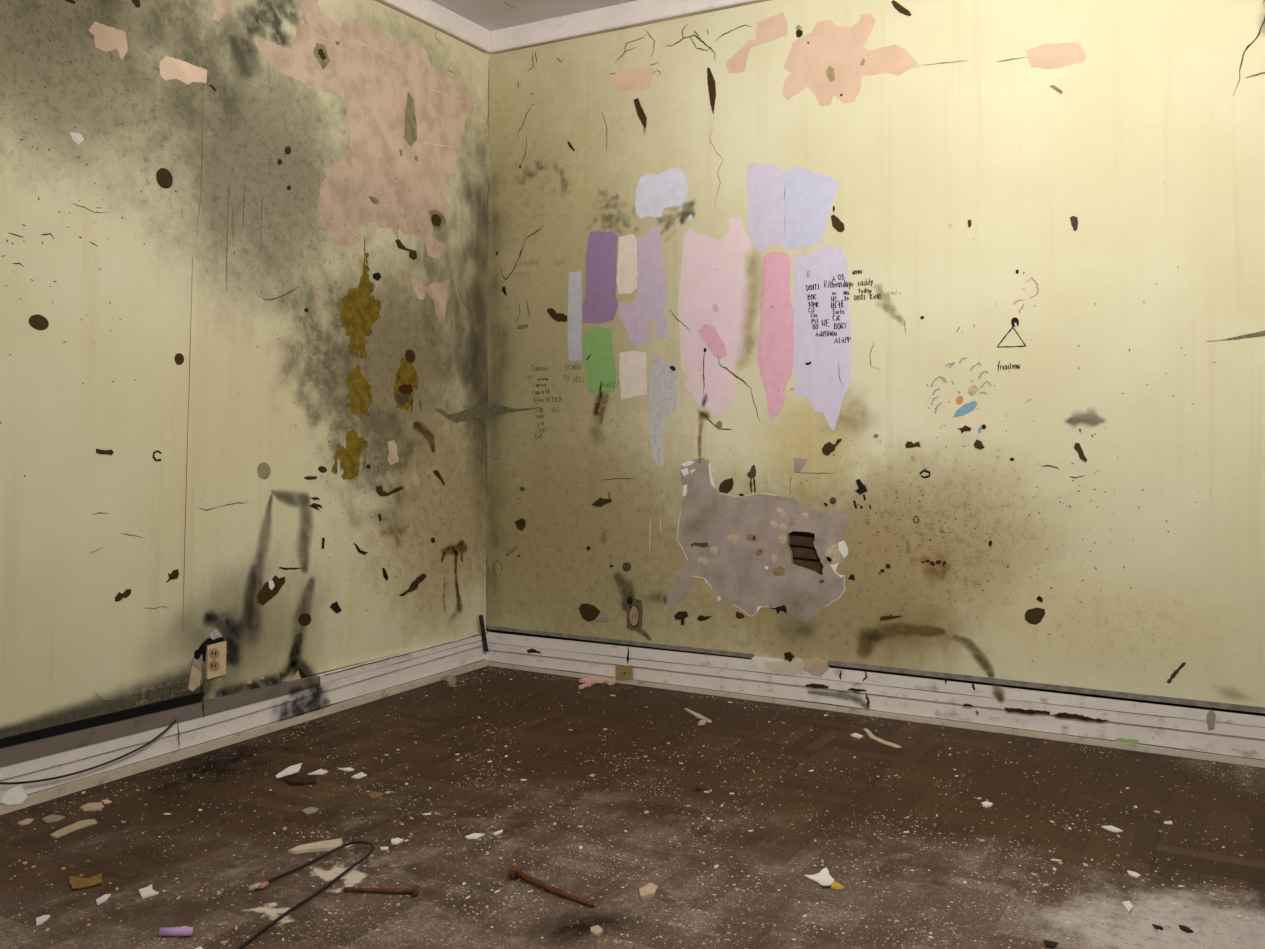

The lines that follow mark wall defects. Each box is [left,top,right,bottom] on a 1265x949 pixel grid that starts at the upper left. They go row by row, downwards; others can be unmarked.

damp [232,0,297,69]
crack [611,24,751,74]
peeling [727,12,920,106]
peeling [1025,42,1087,69]
crack [1234,0,1265,94]
peeling [253,0,479,259]
peeling [411,278,451,320]
damp [276,236,411,488]
spalling [663,458,848,621]
damp [859,624,1004,702]